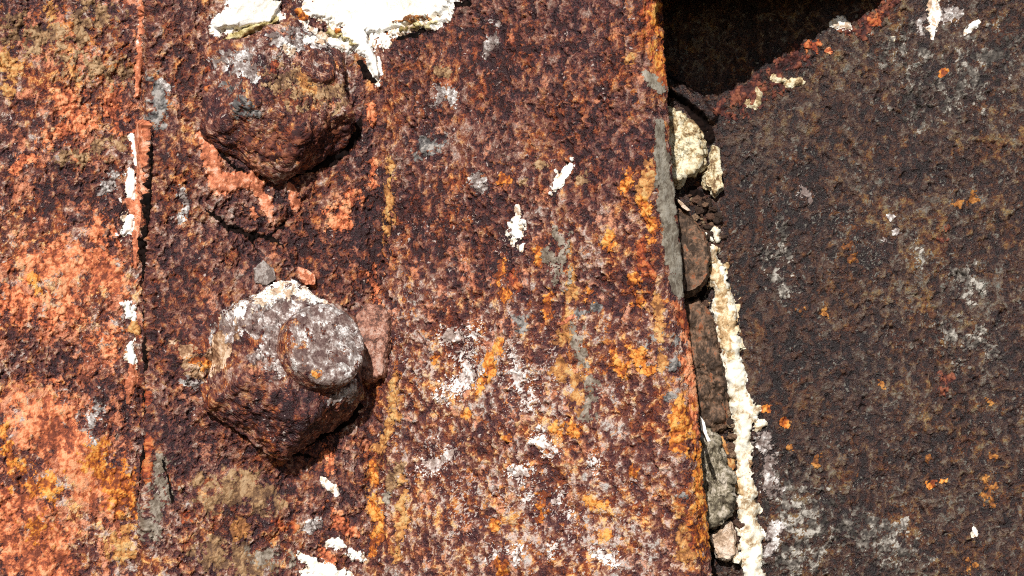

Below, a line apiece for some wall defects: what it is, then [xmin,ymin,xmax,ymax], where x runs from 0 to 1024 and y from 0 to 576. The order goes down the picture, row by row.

water stain [206,1,357,131]
corrosion [234,56,378,167]
water stain [392,14,438,33]
corrosion [624,0,668,86]
corrosion [0,0,152,404]
corrosion [195,131,275,226]
corrosion [320,154,397,246]
corrosion [0,378,138,576]
corrosion [168,298,247,390]
corrosion [302,262,411,565]
corrosion [605,158,711,566]
water stain [707,246,746,375]